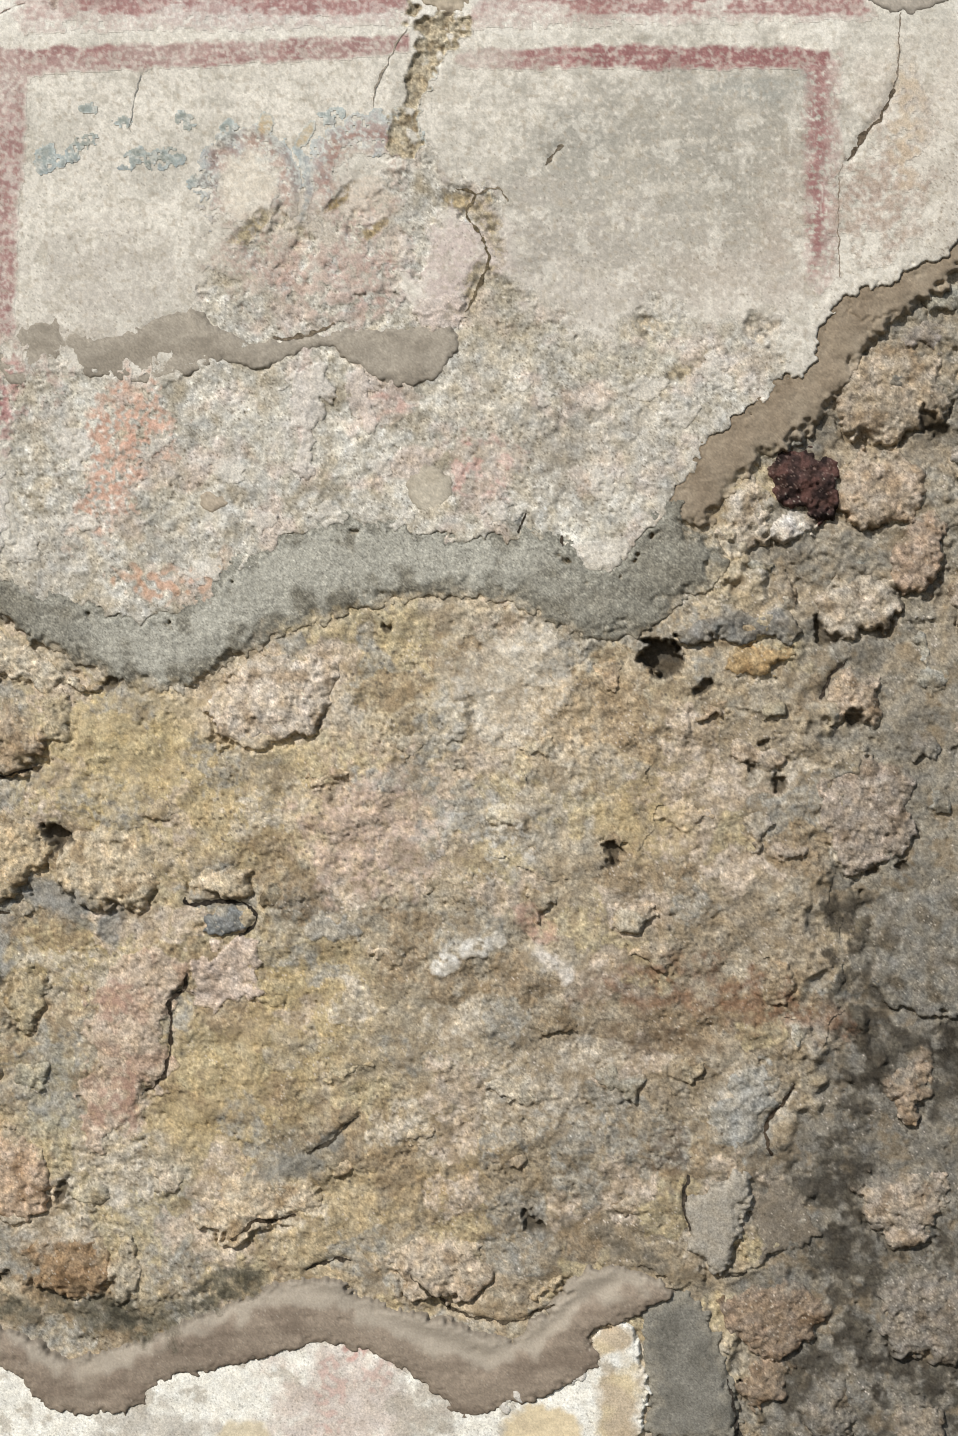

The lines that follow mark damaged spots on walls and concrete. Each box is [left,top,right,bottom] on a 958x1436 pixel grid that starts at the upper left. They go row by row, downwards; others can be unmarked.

crack [836,12,901,277]
flaking render [304,910,363,943]
flaking render [72,928,265,1156]
crack [145,973,194,1092]
flaking render [707,1054,788,1153]
crack [763,1084,795,1156]